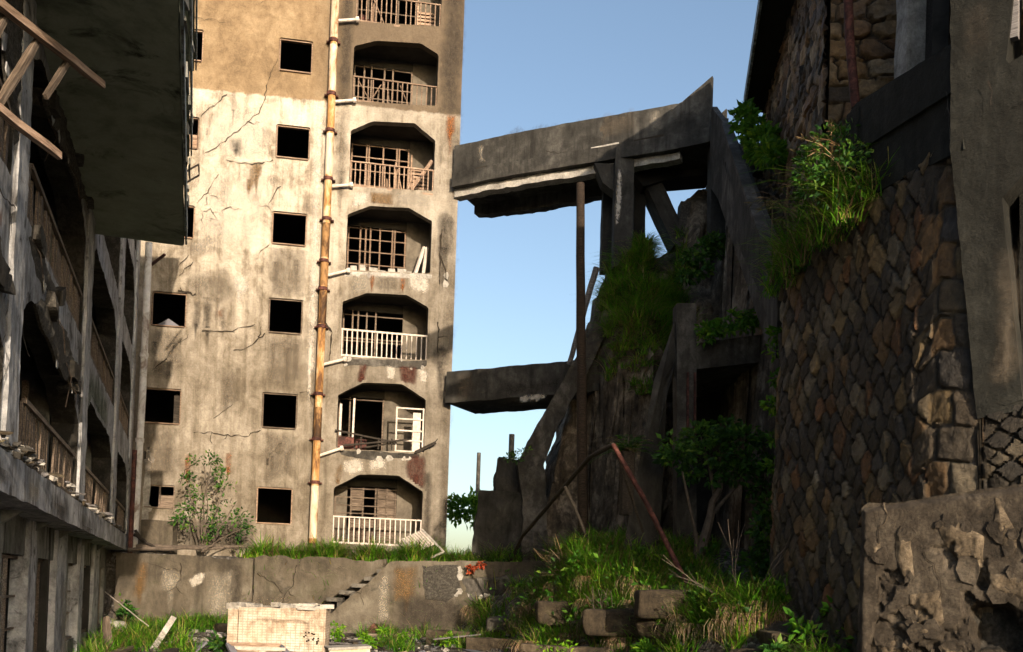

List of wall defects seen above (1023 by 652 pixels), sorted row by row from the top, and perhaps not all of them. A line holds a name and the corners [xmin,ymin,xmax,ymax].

crack [201,59,281,228]
crack [154,324,265,369]
crack [194,404,282,455]
rust [407,457,425,487]
crack [257,565,297,601]
spalling [864,525,962,652]
spalling [935,498,1023,650]